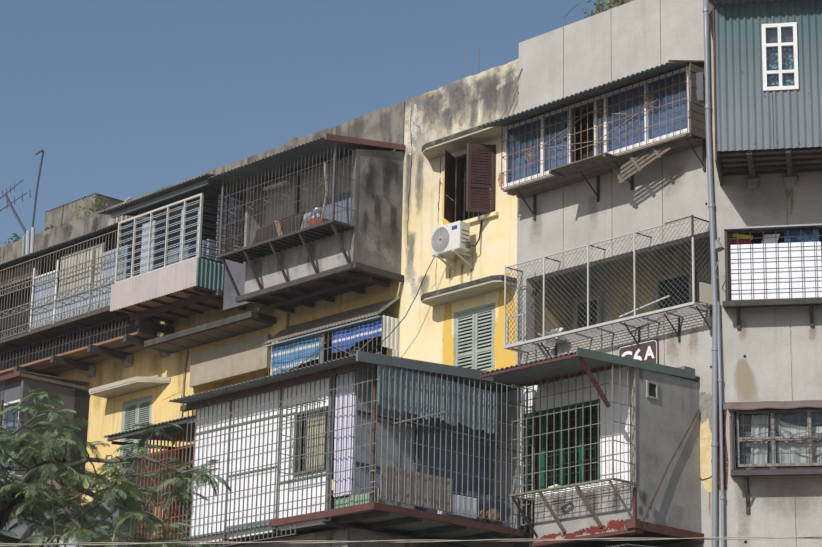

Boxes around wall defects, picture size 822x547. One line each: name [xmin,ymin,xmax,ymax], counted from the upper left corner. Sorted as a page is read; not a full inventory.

leakage [425,73,511,127]
leakage [406,152,422,204]
peeling [699,392,728,493]
peeling [532,518,627,542]